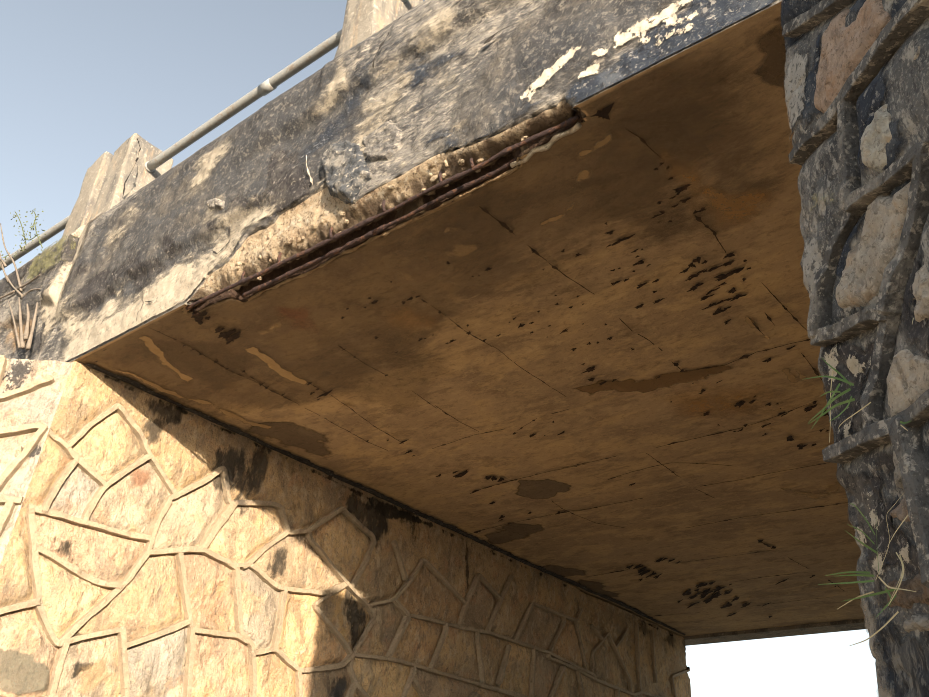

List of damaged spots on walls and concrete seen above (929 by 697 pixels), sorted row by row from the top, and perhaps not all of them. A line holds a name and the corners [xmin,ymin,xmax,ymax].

peeling [520,47,581,102]
water stain [562,49,662,102]
peeling [578,0,699,80]
water stain [752,18,822,139]
water stain [190,143,228,189]
spalling [185,100,614,325]
water stain [41,206,275,362]
crack [136,271,404,451]
crack [415,298,569,449]
spalling [680,252,751,325]
crack [619,283,822,380]
crack [473,403,830,498]